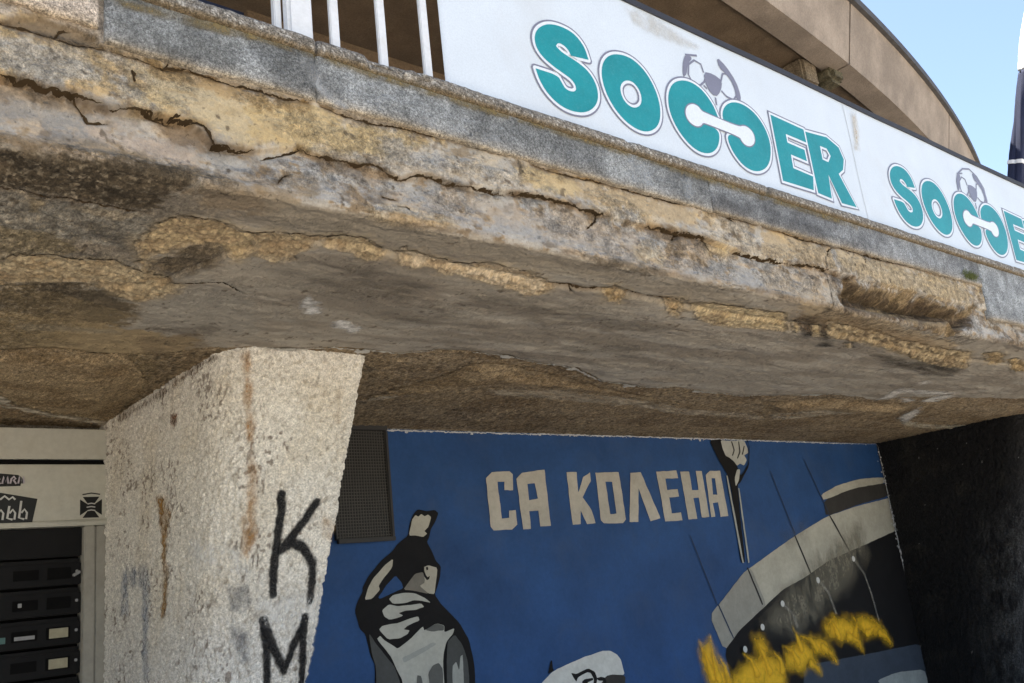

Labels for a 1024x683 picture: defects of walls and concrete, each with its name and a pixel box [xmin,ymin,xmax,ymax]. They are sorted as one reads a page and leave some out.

crack [0,23,680,229]
spalling [0,216,555,303]
crack [645,226,704,242]
crack [732,231,933,281]
spalling [663,255,1024,372]
rust [156,497,171,618]